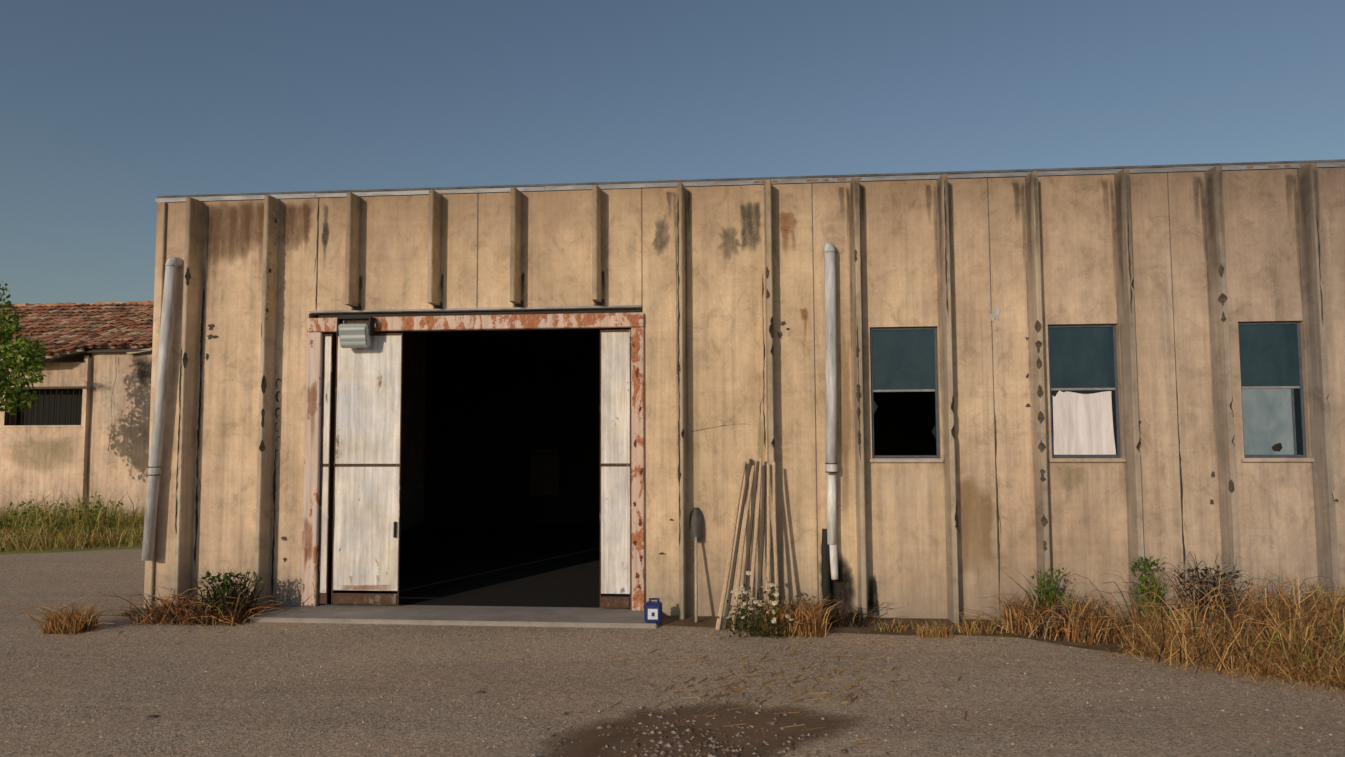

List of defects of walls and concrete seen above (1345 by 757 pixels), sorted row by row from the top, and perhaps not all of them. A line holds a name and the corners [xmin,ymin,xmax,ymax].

leakage [290,205,328,244]
leakage [725,207,758,245]
leakage [655,223,687,292]
leakage [133,358,152,382]